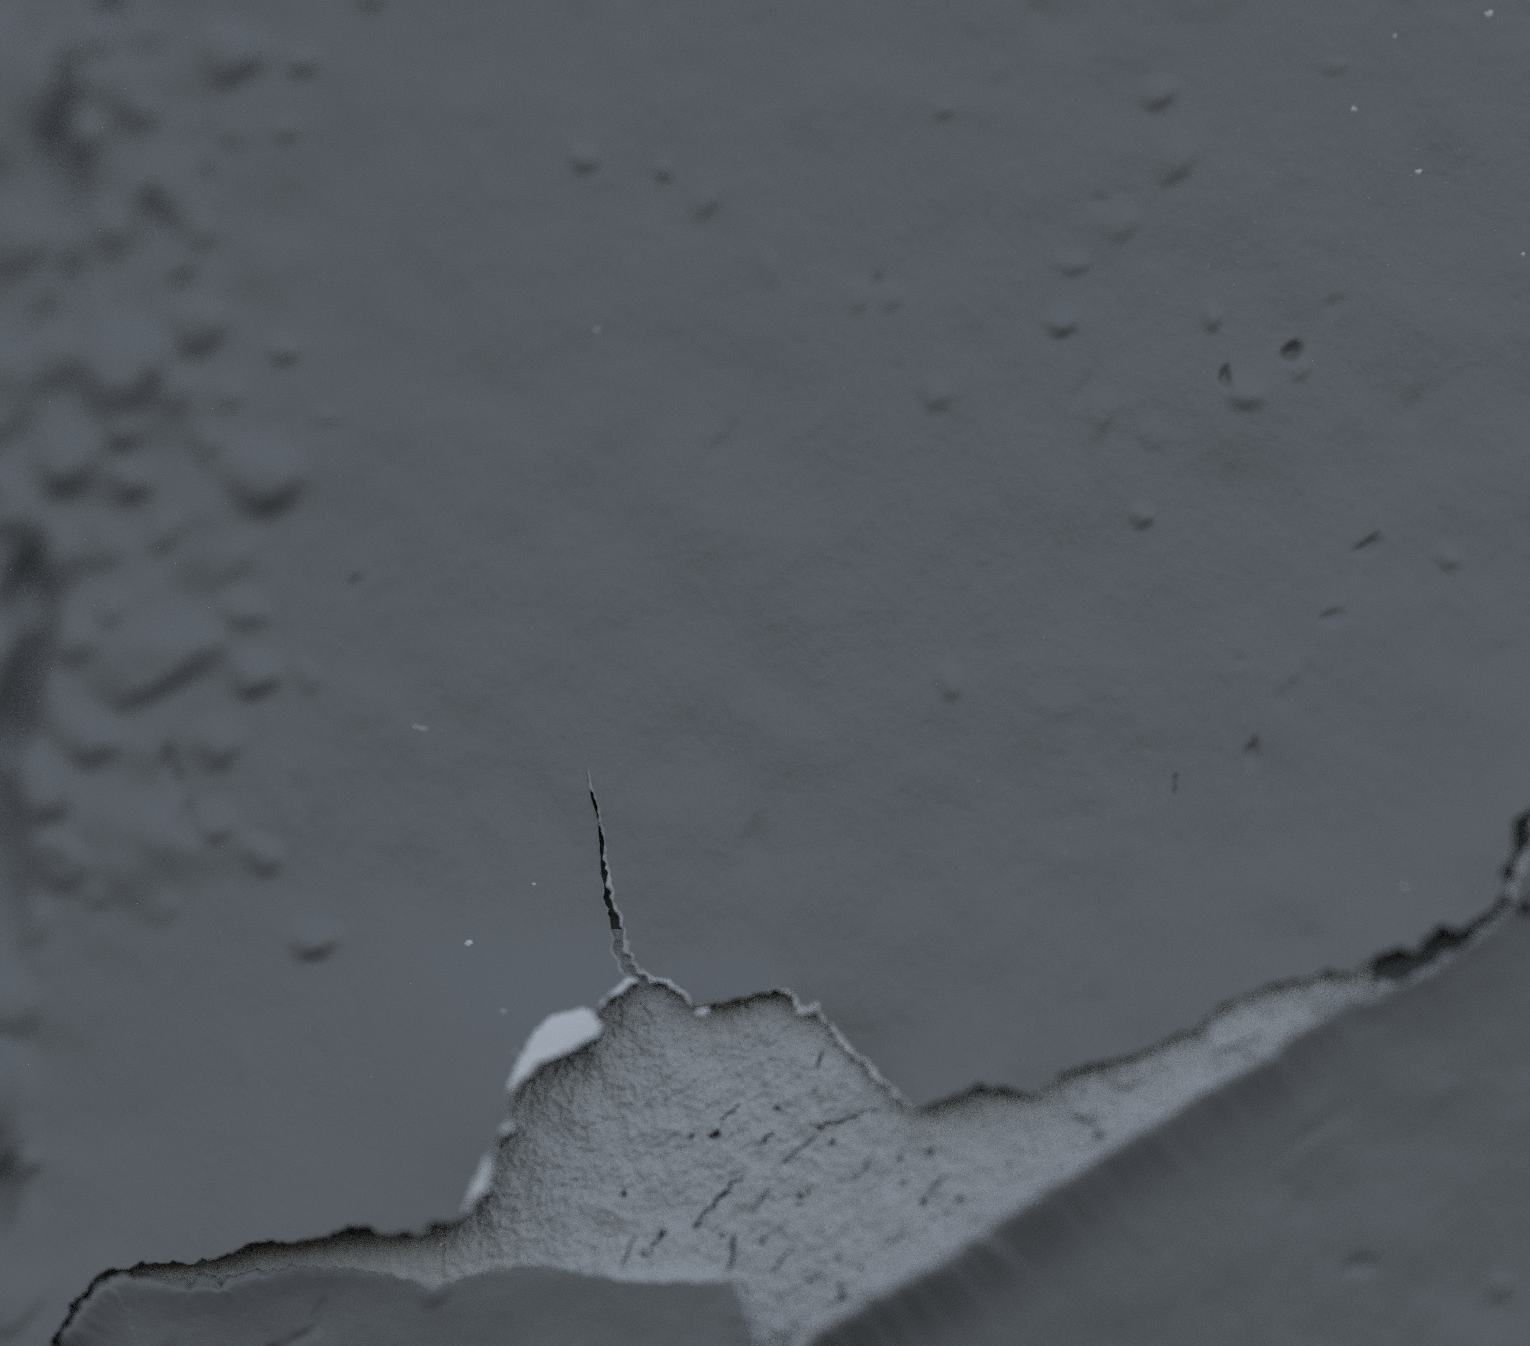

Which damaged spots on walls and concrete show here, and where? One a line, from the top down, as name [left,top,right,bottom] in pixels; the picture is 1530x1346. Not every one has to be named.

crack [586,771,622,929]
crack [1372,810,1530,989]
peeling [50,745,1530,1346]
crack [622,1107,880,1270]
crack [55,1222,445,1346]
crack [772,1245,845,1304]